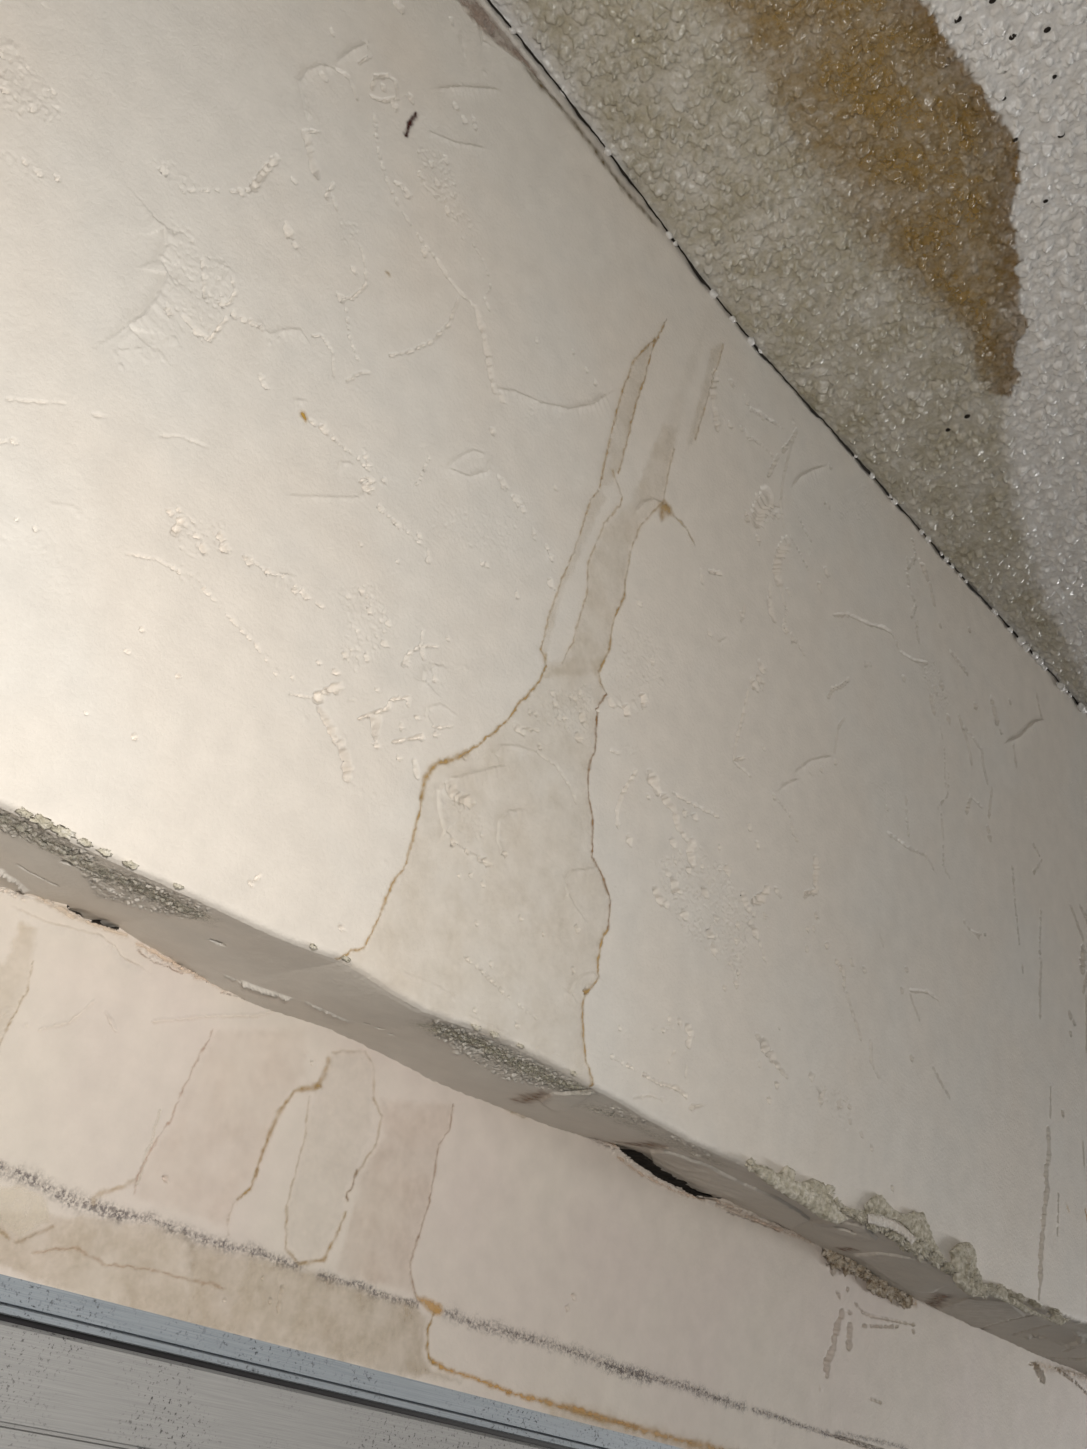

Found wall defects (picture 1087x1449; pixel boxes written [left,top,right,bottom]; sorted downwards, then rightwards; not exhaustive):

water stain [731,0,1020,370]
crack [487,0,1079,705]
flaking render [641,761,784,994]
crack [0,1153,920,1449]
flaking render [426,1018,859,1397]
peeling [866,1180,1070,1328]
crack [1035,1083,1086,1304]